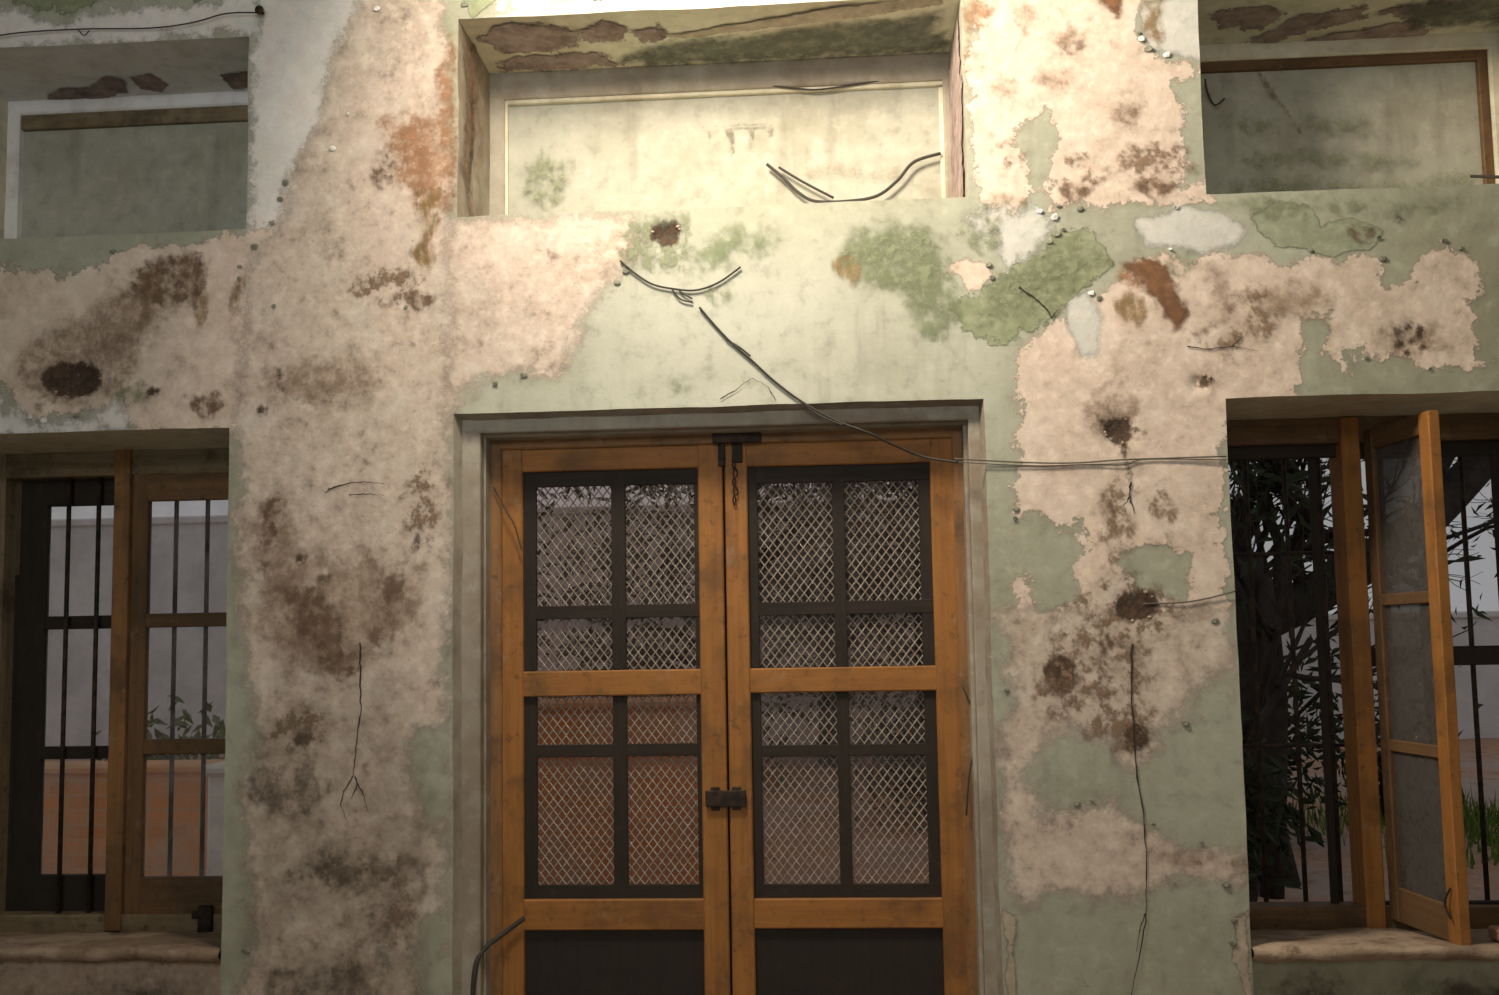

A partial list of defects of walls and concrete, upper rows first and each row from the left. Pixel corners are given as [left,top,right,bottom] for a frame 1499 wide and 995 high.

peeling [476,0,837,73]
leakage [622,16,949,66]
corrosion [1101,0,1121,18]
corrosion [372,43,483,264]
corrosion [1114,256,1191,329]
leakage [254,498,413,676]
peeling [0,0,688,995]
leakage [405,471,439,550]
peeling [947,0,1488,908]
crack [340,642,369,820]
leakage [1033,629,1157,753]
crack [1130,644,1147,995]